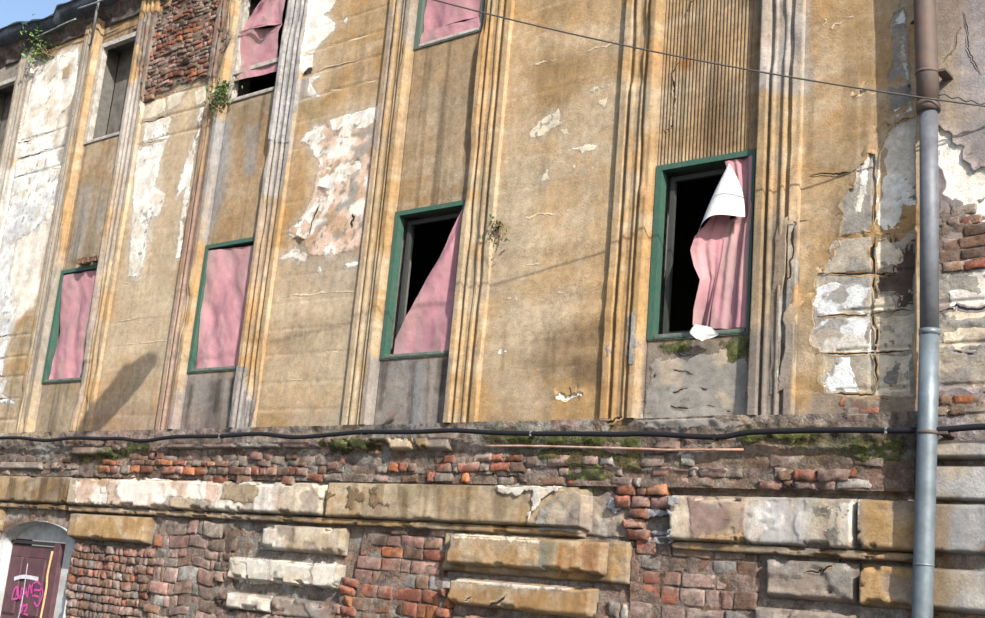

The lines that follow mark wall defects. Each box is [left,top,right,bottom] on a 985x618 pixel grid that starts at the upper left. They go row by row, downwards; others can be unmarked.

crack [943,10,982,75]
flaking render [111,0,234,284]
peeling [268,0,378,273]
peeling [529,109,568,138]
peeling [571,143,602,154]
peeling [0,48,79,405]
flaking render [387,462,416,473]
flaking render [426,452,745,568]